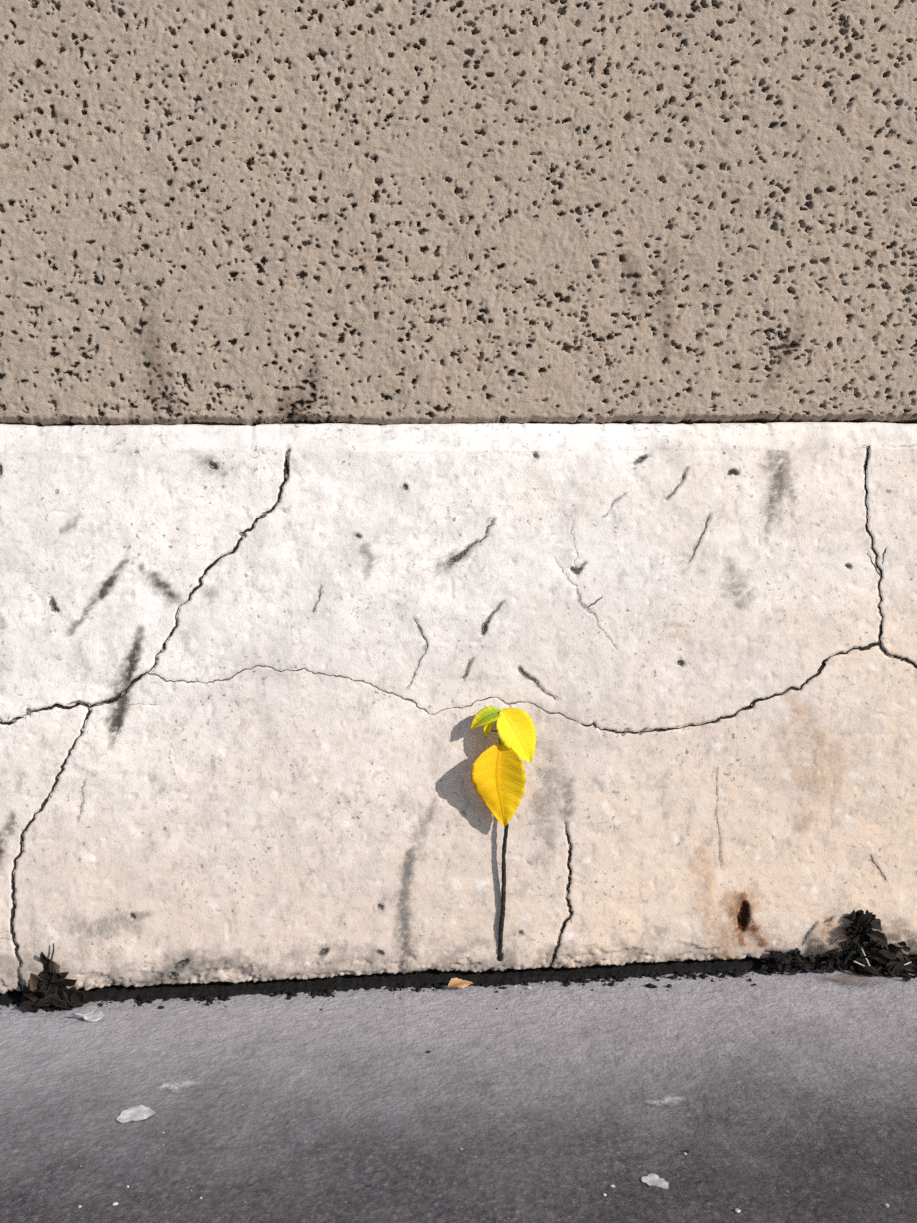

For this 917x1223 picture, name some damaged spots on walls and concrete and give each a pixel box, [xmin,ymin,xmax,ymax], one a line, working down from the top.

crack [0,444,917,992]
rust [720,893,769,959]